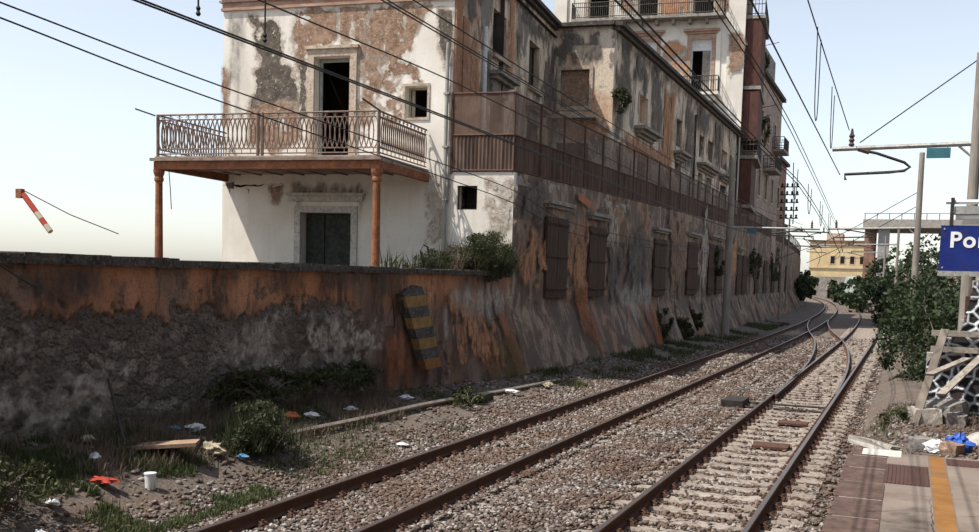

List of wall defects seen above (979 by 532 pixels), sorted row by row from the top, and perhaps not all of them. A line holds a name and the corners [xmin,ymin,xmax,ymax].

peeling [468,0,483,22]
peeling [247,2,455,155]
spalling [231,313,277,386]
spalling [304,313,383,369]
spalling [0,367,128,435]